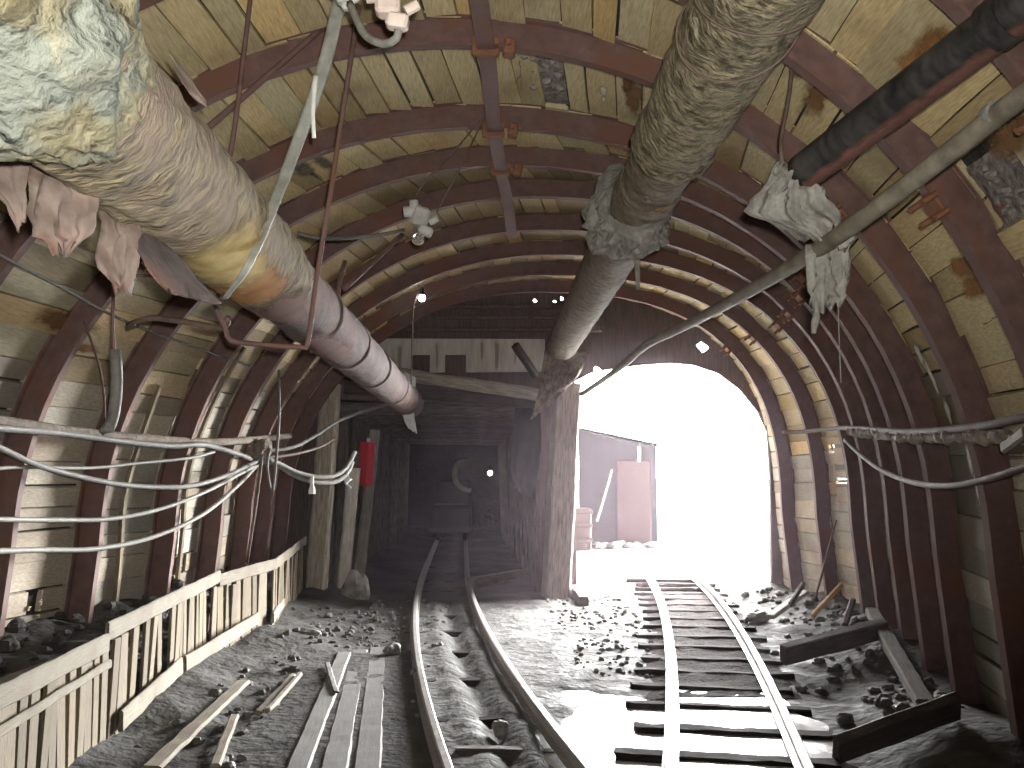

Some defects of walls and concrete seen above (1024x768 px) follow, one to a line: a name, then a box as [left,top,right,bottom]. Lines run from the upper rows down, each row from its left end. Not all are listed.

spalling [520,56,569,105]
rust [802,48,1004,187]
rust [899,31,946,70]
spalling [966,149,1024,228]